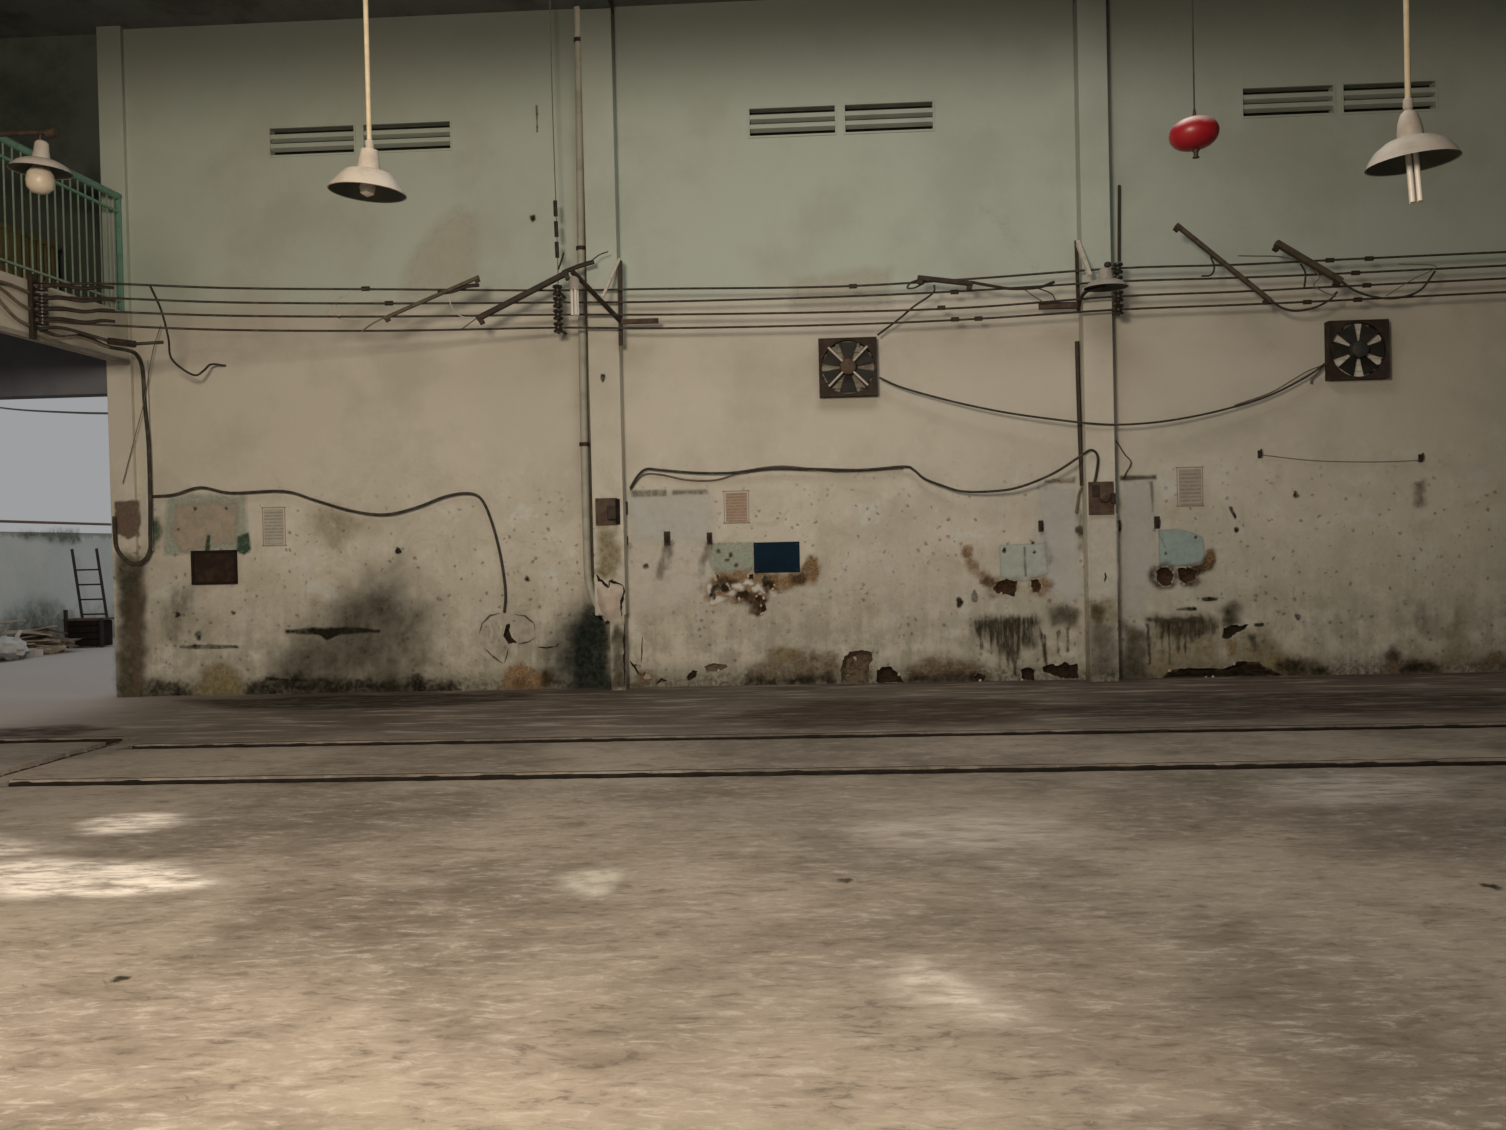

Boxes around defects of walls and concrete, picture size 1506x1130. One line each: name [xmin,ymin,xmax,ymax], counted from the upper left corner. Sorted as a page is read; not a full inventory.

spalling [707,572,777,616]
spalling [956,578,1051,607]
spalling [1150,566,1199,588]
water stain [117,556,456,697]
water stain [556,606,627,689]
spalling [840,650,904,683]
water stain [910,659,980,682]
water stain [974,604,1237,679]